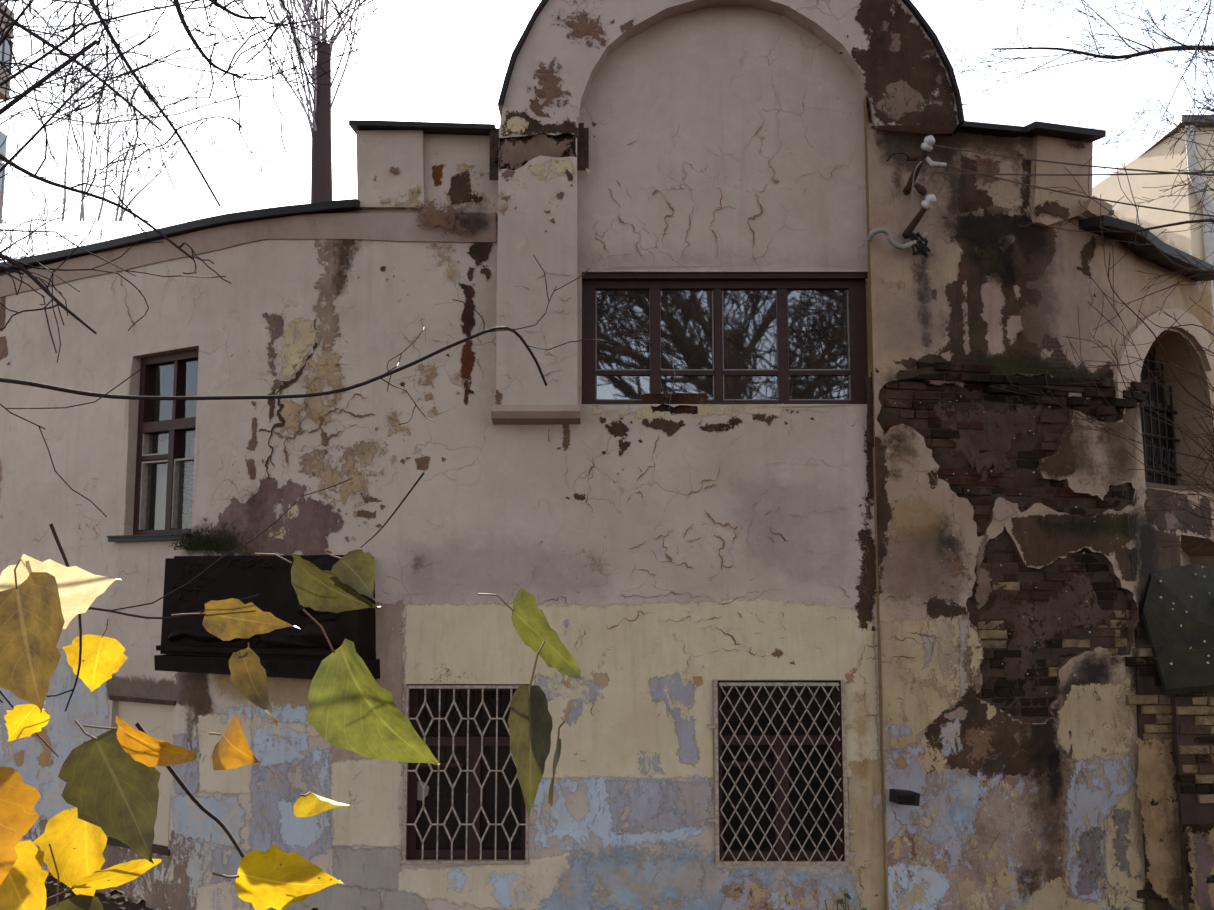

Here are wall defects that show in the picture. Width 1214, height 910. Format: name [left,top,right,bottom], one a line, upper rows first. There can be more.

spalling [839,0,958,130]
crack [594,45,837,260]
leakage [878,131,1104,379]
crack [259,318,375,479]
spalling [204,239,446,556]
crack [533,429,595,516]
crack [607,436,964,766]
spalling [855,150,1214,910]
peeling [648,665,705,780]
peeling [20,813,53,876]
spalling [96,830,253,910]
peeling [277,798,331,852]